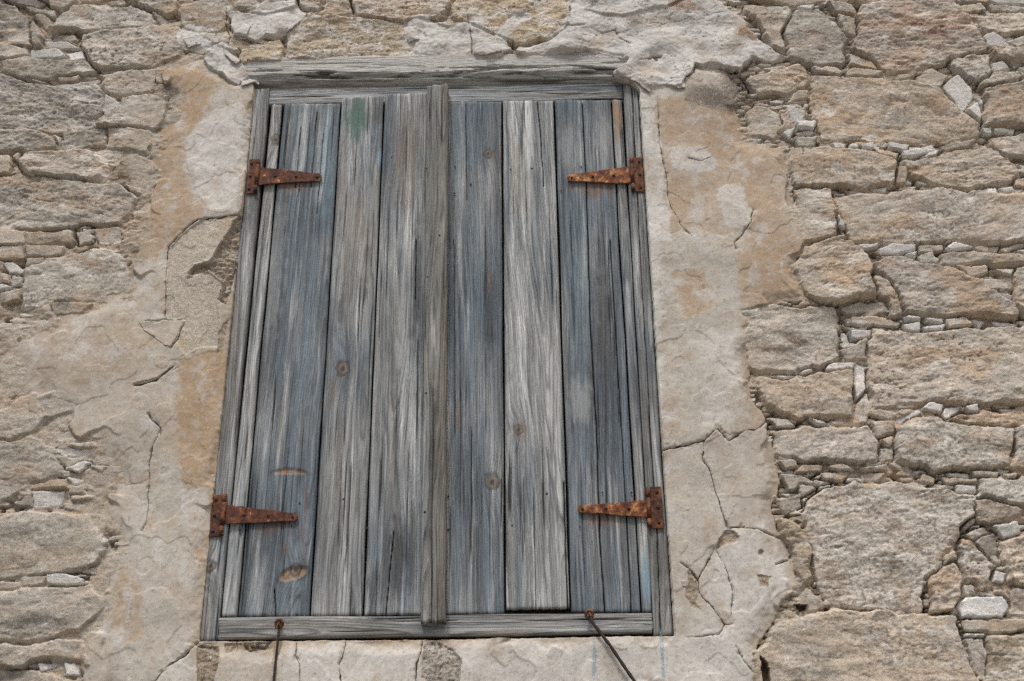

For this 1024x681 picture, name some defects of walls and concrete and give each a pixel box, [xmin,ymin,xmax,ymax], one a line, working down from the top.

flaking render [135,215,242,384]
crack [136,215,243,386]
crack [664,423,788,637]